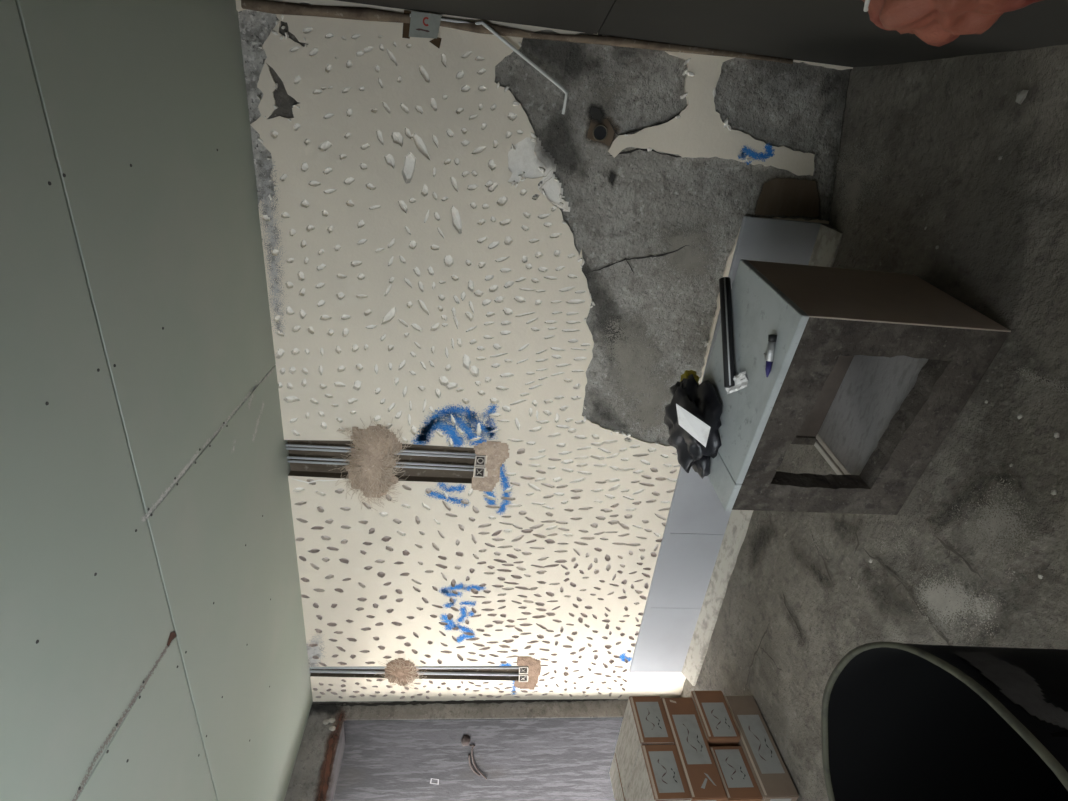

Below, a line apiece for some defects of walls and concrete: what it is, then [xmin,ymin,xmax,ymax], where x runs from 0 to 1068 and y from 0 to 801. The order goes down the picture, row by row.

spalling [238,9,844,699]
crack [591,245,688,273]